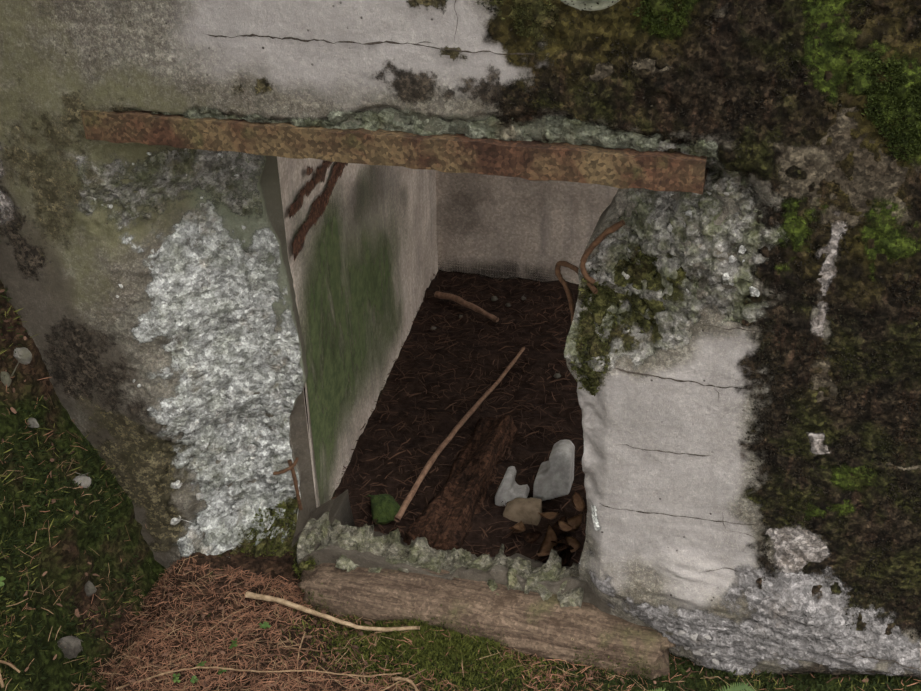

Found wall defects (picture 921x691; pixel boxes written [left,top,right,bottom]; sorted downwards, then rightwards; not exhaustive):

crack [203,0,534,55]
rust [289,161,348,261]
spalling [183,107,786,377]
spalling [65,147,304,558]
crack [612,367,745,395]
crack [620,444,711,457]
crack [600,503,755,538]
peeling [766,526,830,574]
spalling [589,570,801,676]